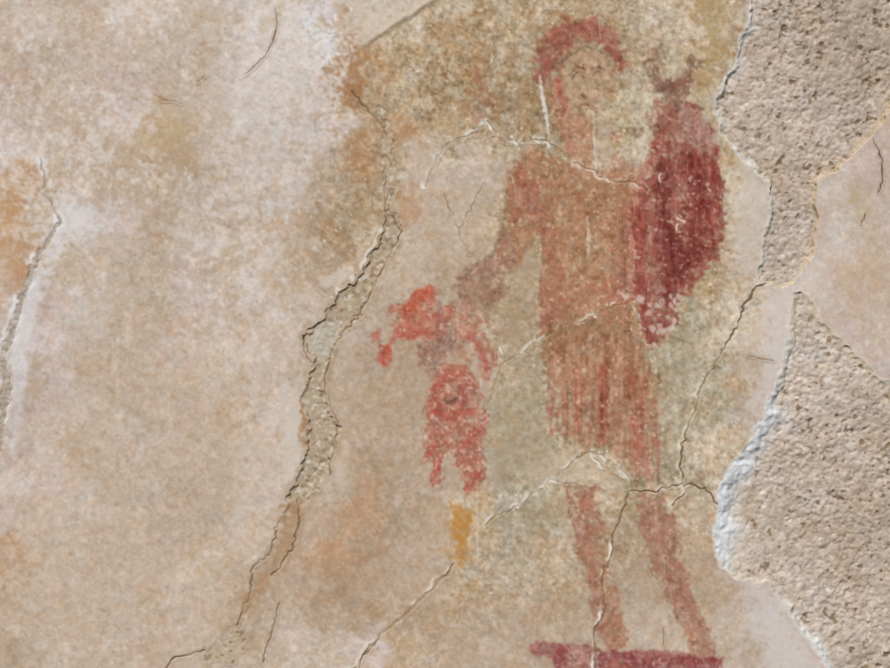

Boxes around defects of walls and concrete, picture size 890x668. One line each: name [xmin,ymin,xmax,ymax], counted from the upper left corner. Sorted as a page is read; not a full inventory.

crack [0,151,69,473]
crack [161,88,776,668]
crack [483,32,501,77]
spalling [711,0,890,668]